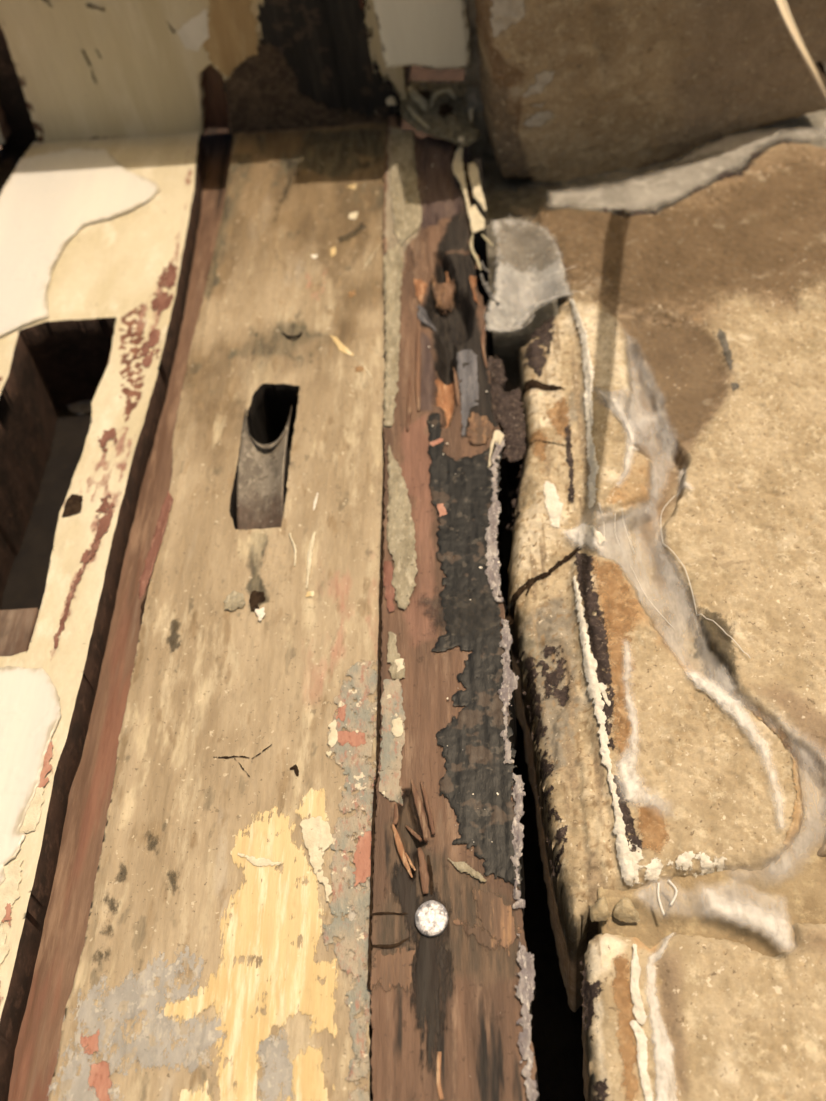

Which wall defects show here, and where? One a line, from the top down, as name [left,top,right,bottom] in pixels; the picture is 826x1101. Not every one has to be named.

peeling [167,0,258,78]
leakage [222,0,404,136]
peeling [0,148,160,336]
leakage [523,316,555,377]
leakage [543,298,600,529]
peeling [0,666,61,964]
peeling [47,632,416,1101]
peeling [383,445,418,612]
peeling [426,412,585,1101]
crack [505,546,582,625]
leakage [515,552,727,887]
leakage [694,608,737,693]